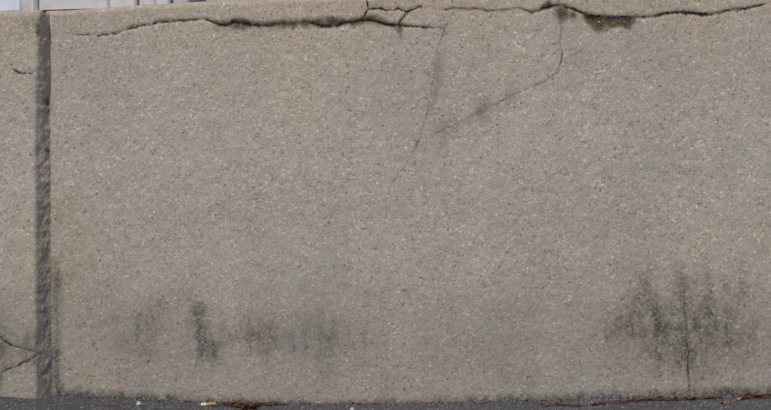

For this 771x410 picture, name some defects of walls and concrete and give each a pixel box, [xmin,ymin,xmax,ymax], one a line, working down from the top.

crack [78,18,275,36]
crack [303,0,766,28]
crack [0,336,37,371]